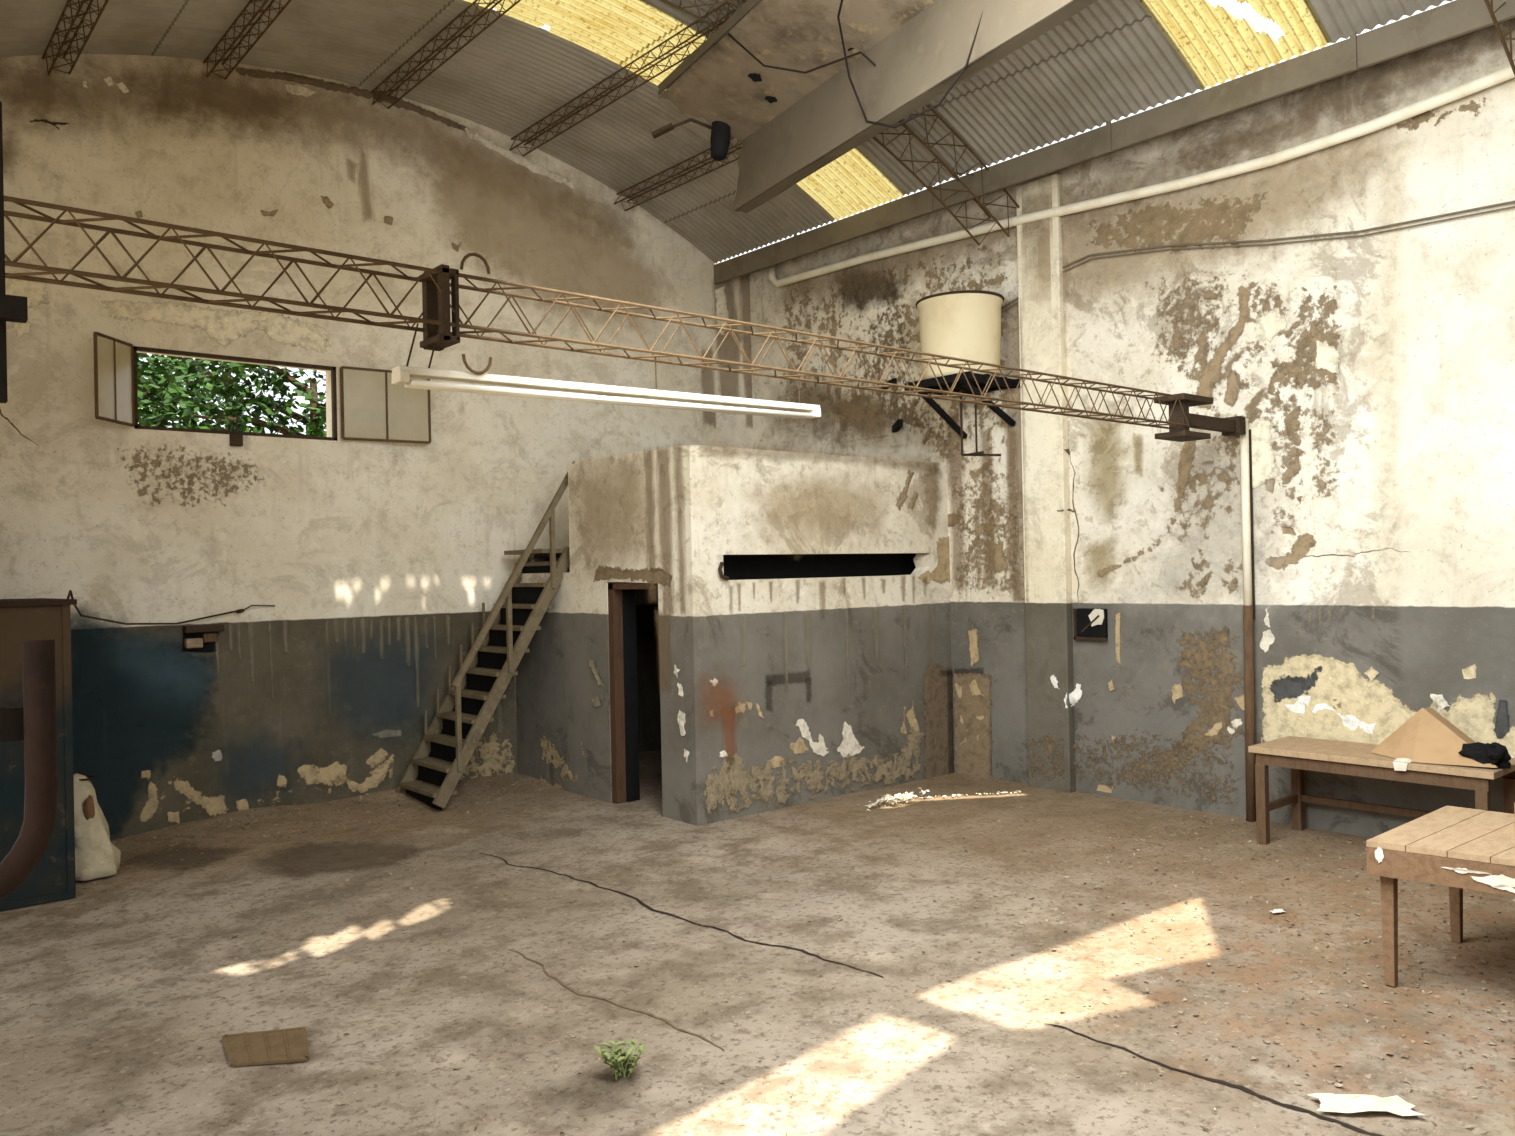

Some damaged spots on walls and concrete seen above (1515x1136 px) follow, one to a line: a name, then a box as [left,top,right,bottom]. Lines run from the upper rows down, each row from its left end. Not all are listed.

peeling [1094,272,1342,598]
flaking render [703,628,1021,815]
peeling [1027,607,1515,804]
peeling [140,747,397,824]
crack [481,853,884,977]
crack [508,949,725,1051]
crack [1044,1023,1384,1136]